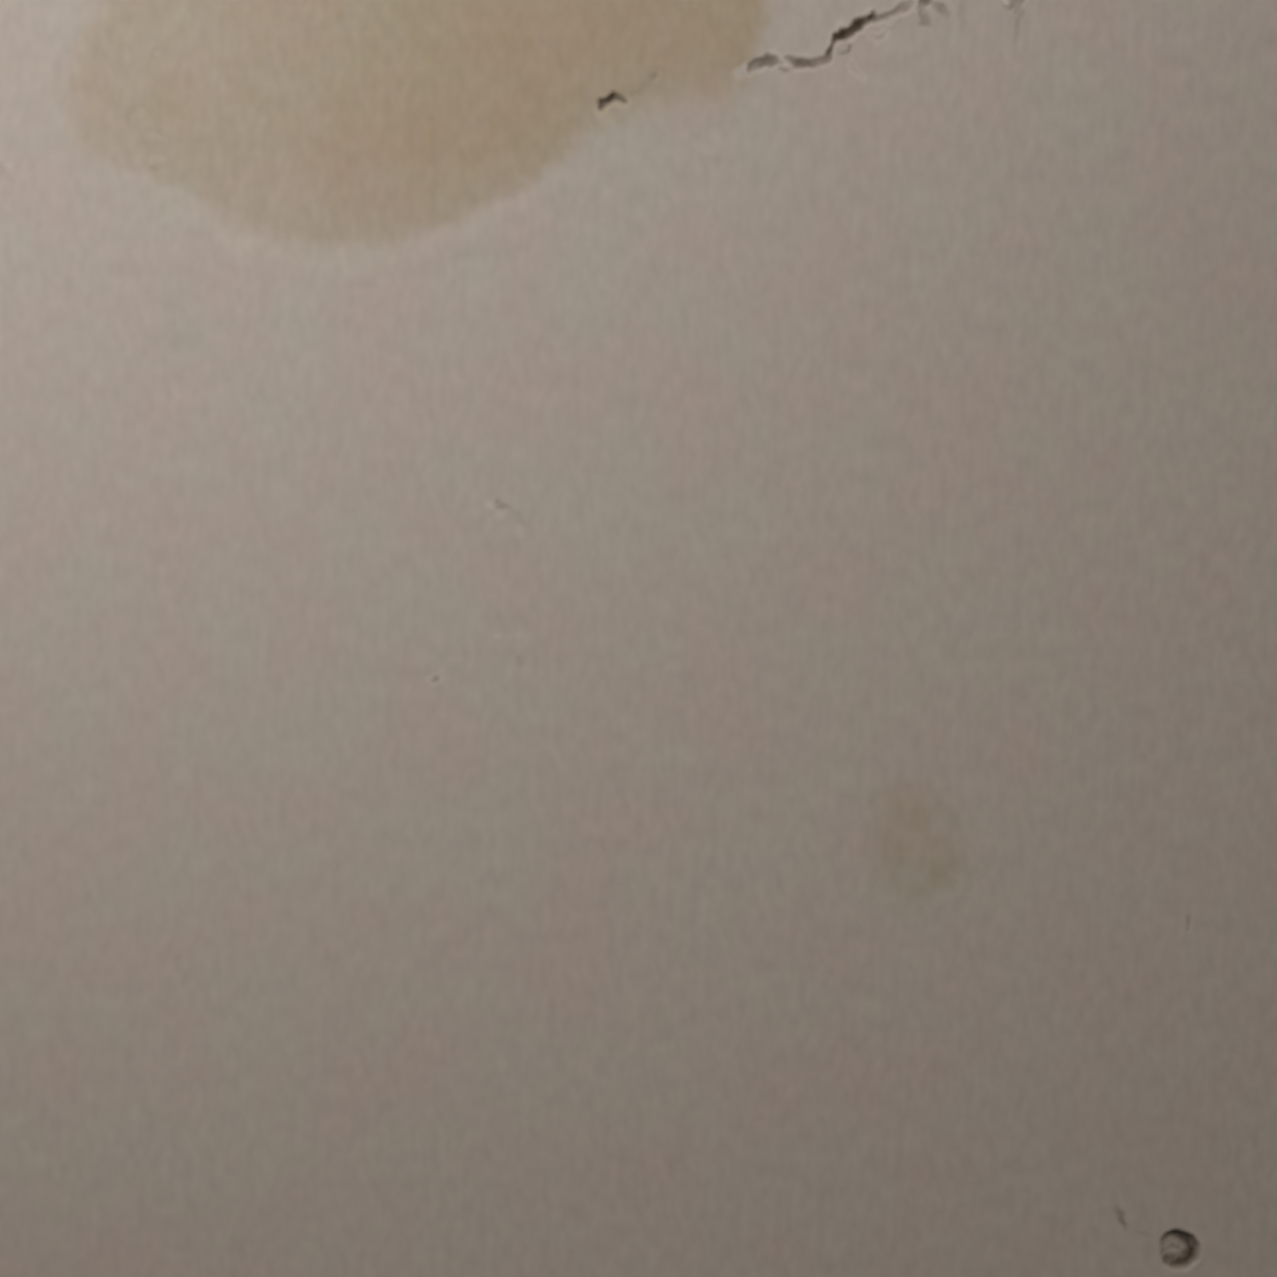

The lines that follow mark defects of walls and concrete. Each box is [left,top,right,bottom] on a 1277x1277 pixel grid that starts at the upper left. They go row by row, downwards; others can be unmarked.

damp [47,0,783,288]
crack [731,0,974,86]